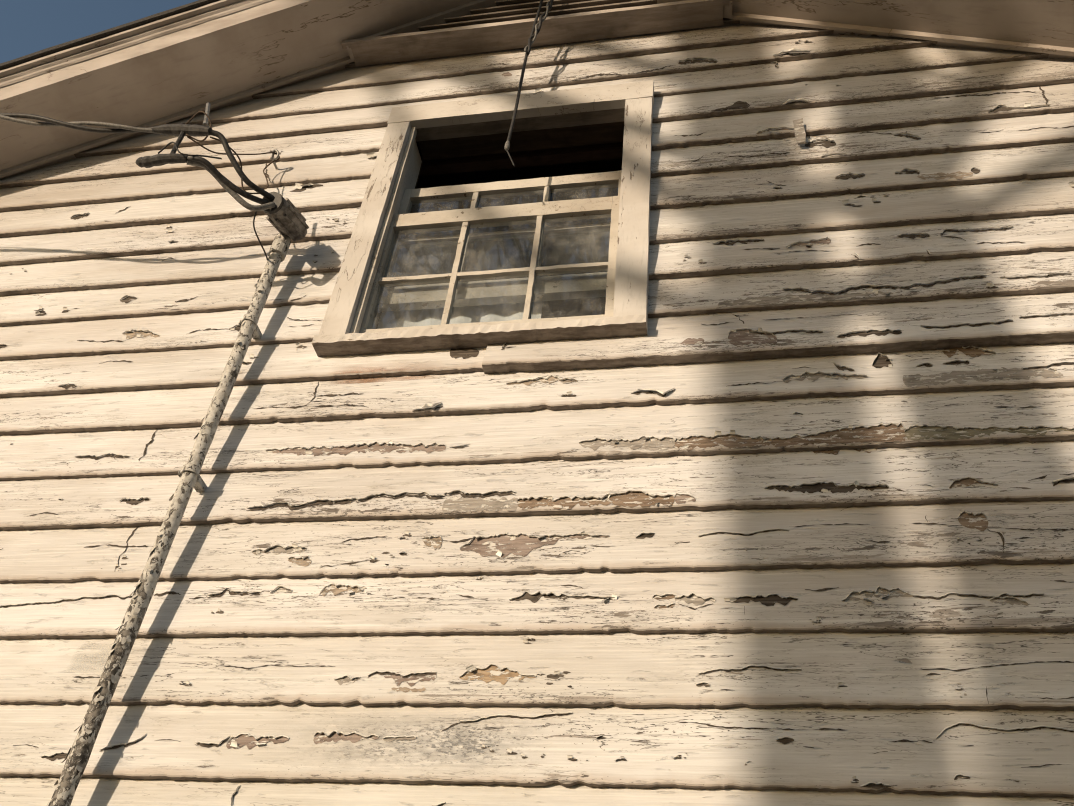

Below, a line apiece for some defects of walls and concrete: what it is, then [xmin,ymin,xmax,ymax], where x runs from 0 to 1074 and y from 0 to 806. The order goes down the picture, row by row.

peeling [728,328,777,347]
peeling [579,423,1074,455]
peeling [442,490,696,513]
peeling [957,511,988,544]
peeling [460,531,609,558]
peeling [652,593,798,609]
peeling [842,586,912,602]
peeling [989,596,1028,606]
peeling [459,664,572,687]
crack [869,652,1074,754]
peeling [226,733,289,749]